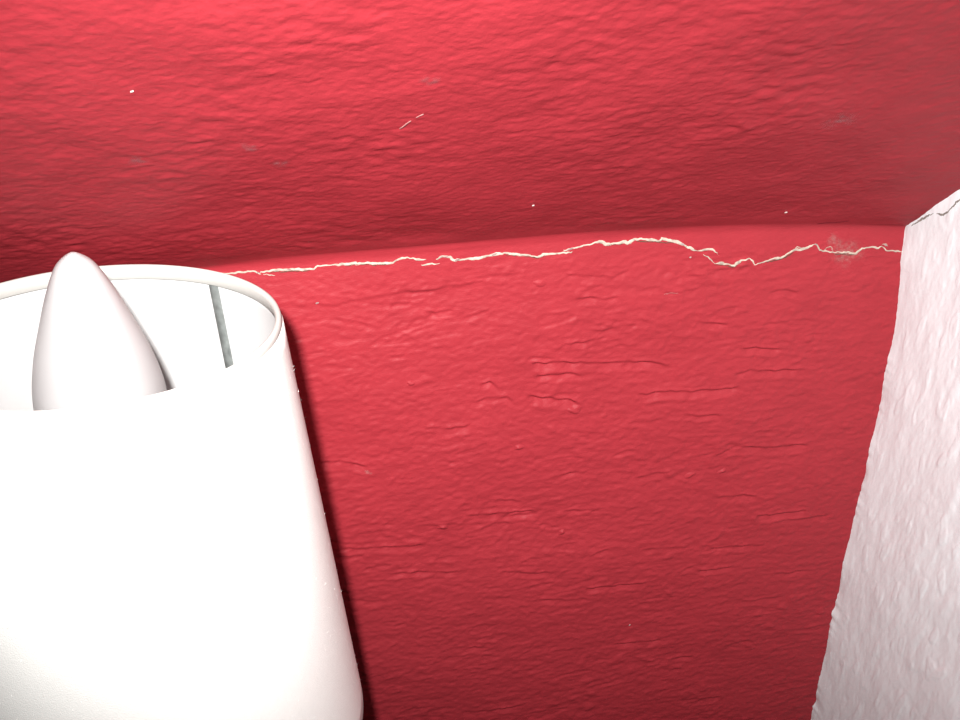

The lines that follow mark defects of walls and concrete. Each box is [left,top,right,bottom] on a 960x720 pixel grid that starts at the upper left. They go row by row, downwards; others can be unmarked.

crack [225,220,901,276]